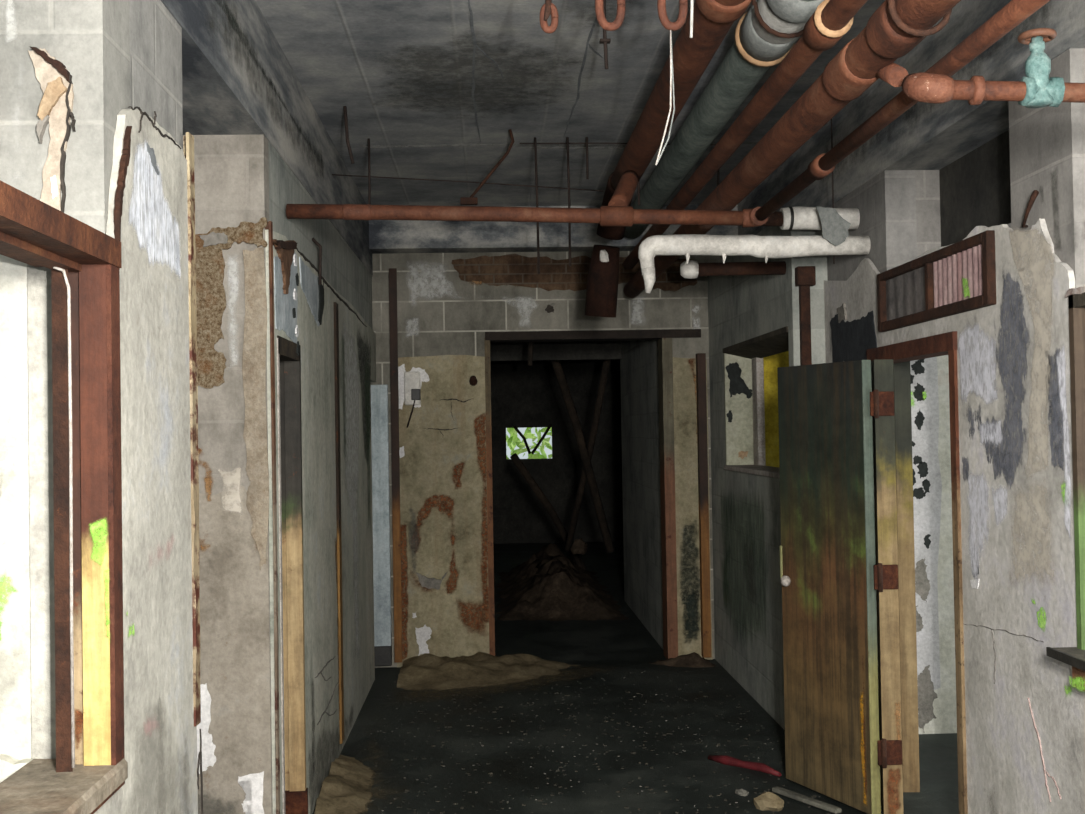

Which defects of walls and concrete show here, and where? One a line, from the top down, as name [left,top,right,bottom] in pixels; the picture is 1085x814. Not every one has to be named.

peeling [28,46,74,211]
crack [128,106,181,149]
flaking render [195,217,324,389]
damp [1010,229,1060,474]
corrosion [198,449,213,501]
peeling [197,684,216,774]
peeling [238,771,264,814]
corrosion [401,462,465,659]
corrosion [446,414,489,633]
damp [680,524,700,642]
peeling [910,357,942,733]
crack [965,624,1043,684]